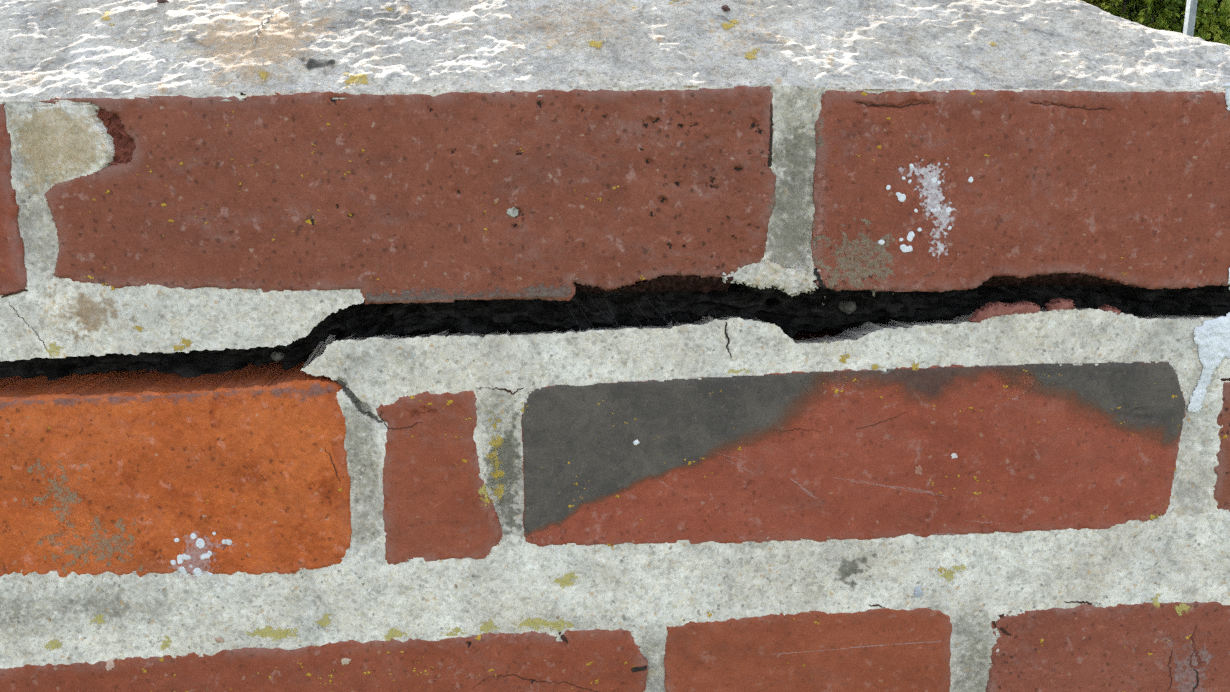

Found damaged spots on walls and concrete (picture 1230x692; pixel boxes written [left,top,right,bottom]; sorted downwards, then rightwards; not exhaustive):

spalling [19,107,136,183]
crack [0,268,1230,381]
crack [337,380,423,430]
crack [475,387,524,395]
crack [1168,625,1202,692]